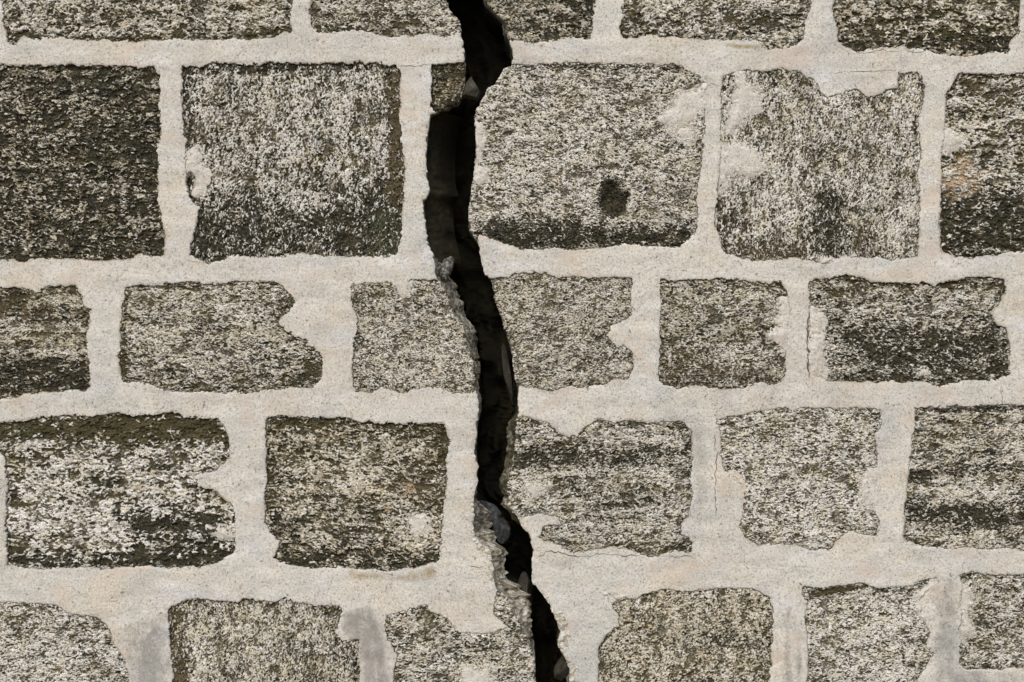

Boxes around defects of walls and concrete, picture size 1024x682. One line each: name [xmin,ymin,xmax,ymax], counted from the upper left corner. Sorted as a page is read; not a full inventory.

crack [423,0,688,682]